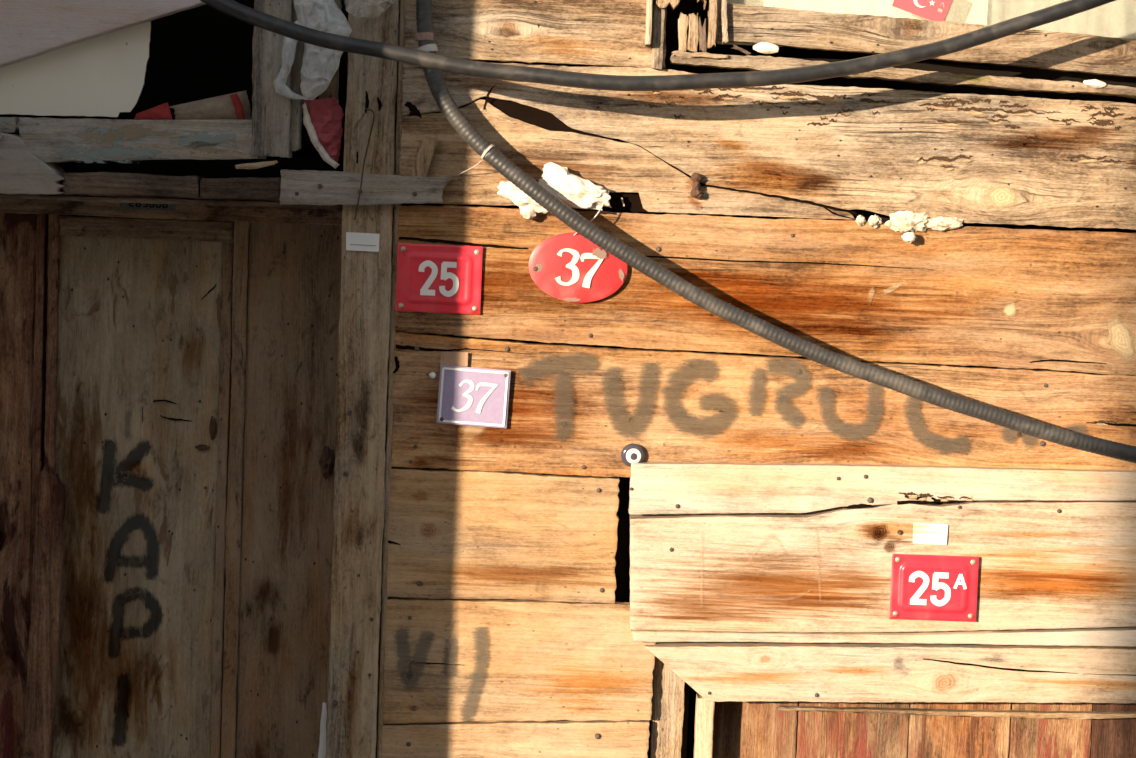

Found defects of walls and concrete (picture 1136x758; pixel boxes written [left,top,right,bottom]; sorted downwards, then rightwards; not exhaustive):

crack [365,91,422,118]
crack [476,85,601,138]
crack [701,185,857,220]
crack [843,495,960,509]